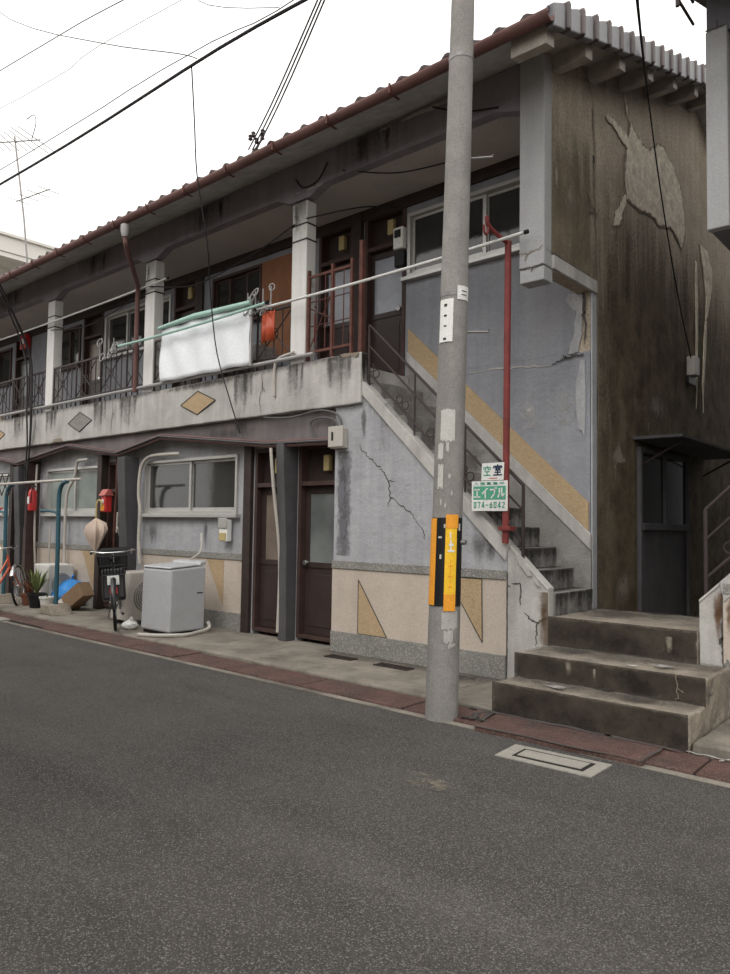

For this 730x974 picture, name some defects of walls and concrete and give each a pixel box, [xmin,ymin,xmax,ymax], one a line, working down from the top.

flaking render [606,93,686,251]
crack [468,67,606,468]
crack [360,448,426,541]
damp [485,143,730,753]
crack [506,573,543,678]